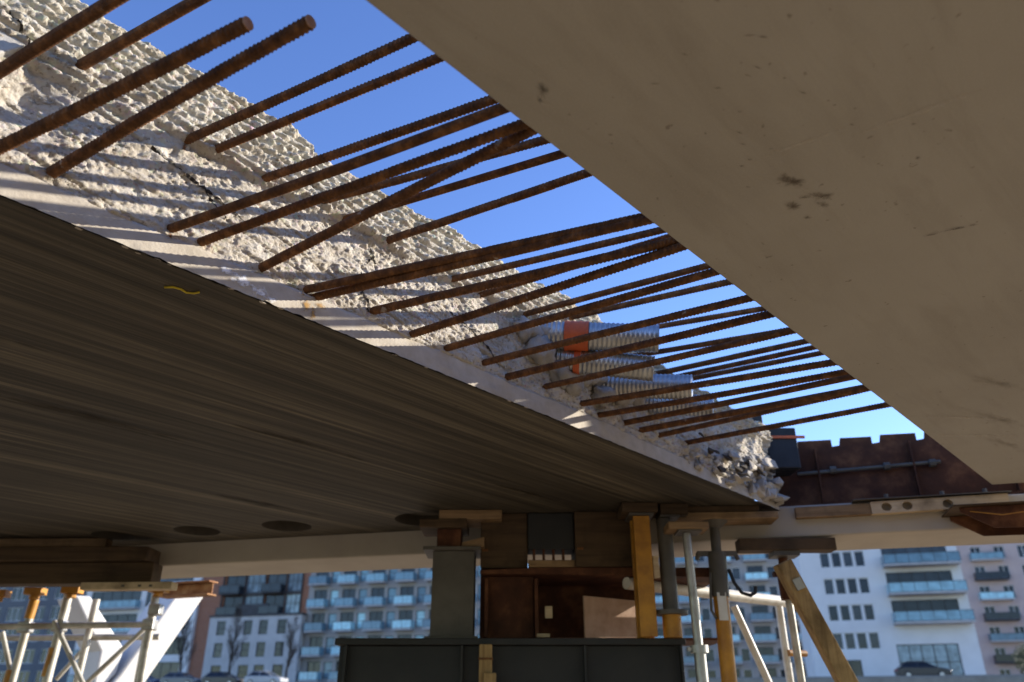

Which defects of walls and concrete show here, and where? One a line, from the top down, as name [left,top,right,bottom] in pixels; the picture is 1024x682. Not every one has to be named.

spalling [0,0,129,88]
spalling [75,0,211,71]
spalling [0,15,316,178]
spalling [184,34,444,153]
crack [151,146,244,221]
spalling [167,95,593,272]
spalling [303,213,891,506]